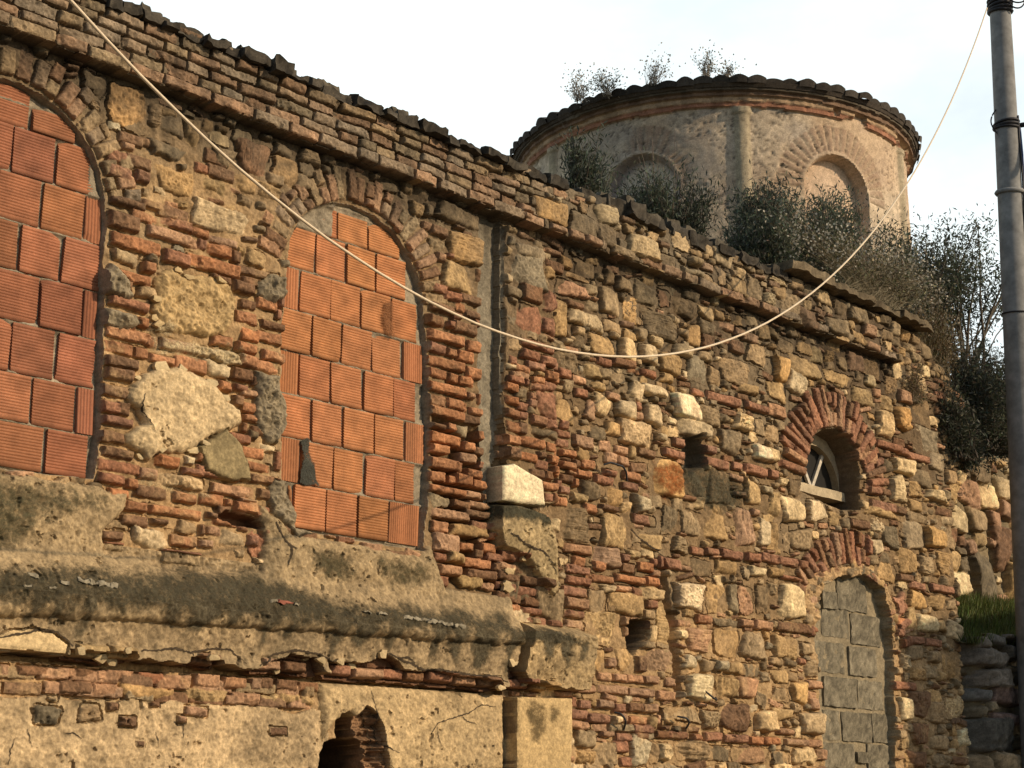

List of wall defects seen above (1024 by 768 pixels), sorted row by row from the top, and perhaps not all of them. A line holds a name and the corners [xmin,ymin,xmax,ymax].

hole [218,510,264,529]
crack [511,532,557,573]
crack [0,629,73,646]
spalling [180,652,225,669]
crack [431,704,496,743]